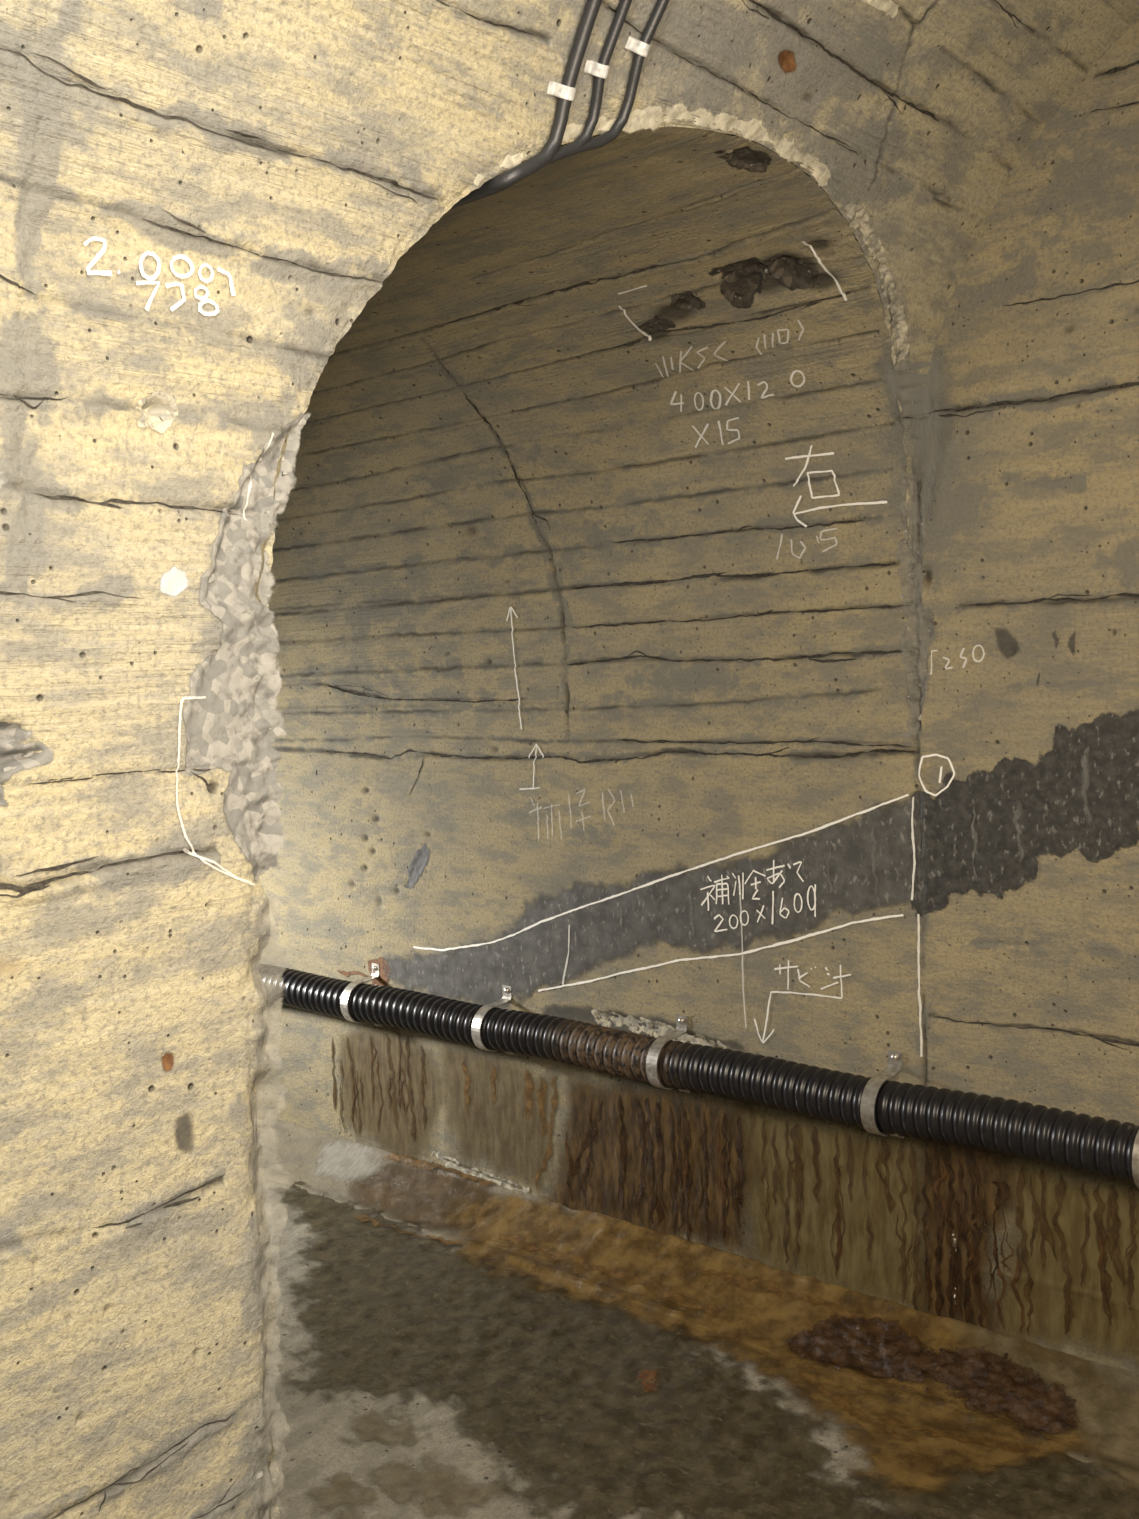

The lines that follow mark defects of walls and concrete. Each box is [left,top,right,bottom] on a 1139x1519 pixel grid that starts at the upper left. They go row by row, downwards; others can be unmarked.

crack [437,0,541,38]
crack [0,48,437,203]
crack [0,274,36,295]
crack [144,210,385,283]
spalling [638,291,706,332]
spalling [708,254,819,309]
crack [904,382,1139,418]
spalling [182,413,310,881]
spalling [0,722,54,806]
crack [0,849,202,898]
rust [331,1027,1139,1490]
leakage [275,1142,1139,1519]